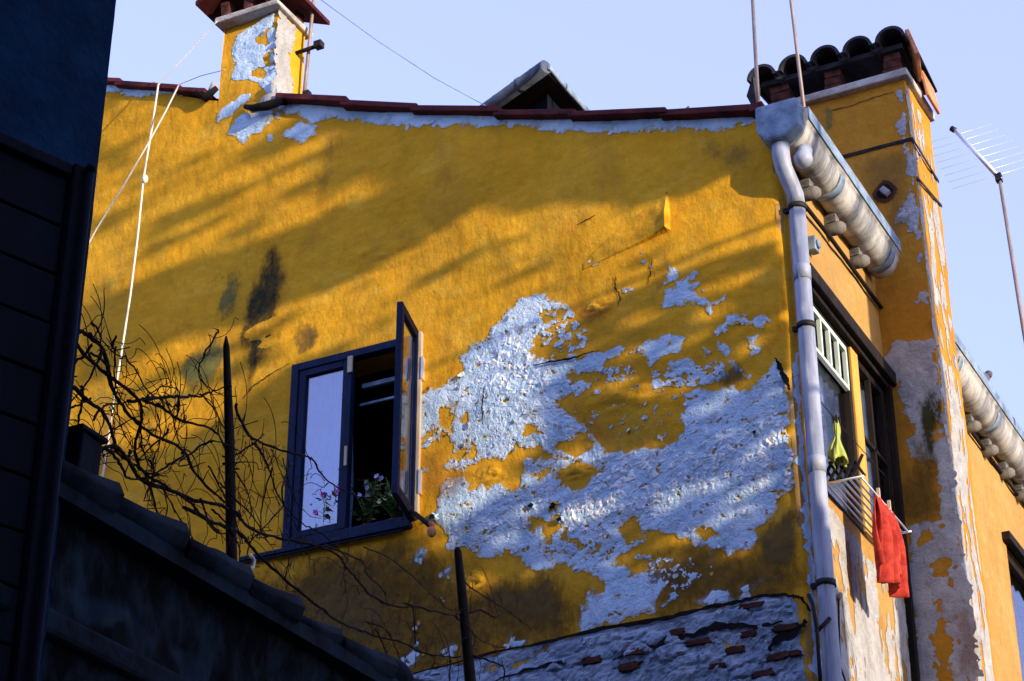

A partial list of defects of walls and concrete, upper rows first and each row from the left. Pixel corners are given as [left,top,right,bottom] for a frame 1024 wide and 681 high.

peeling [212,10,756,145]
damp [295,326,318,351]
peeling [401,262,824,681]
peeling [829,86,995,681]